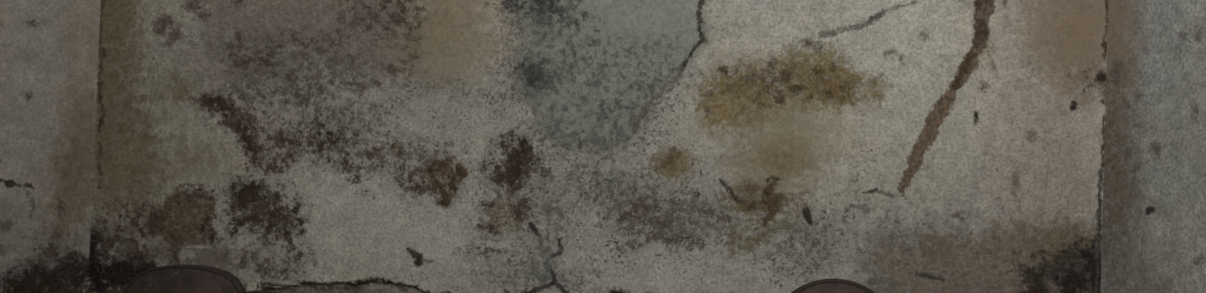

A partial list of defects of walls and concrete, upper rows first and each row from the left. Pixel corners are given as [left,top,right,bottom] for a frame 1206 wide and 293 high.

water stain [0,0,424,293]
mould [485,0,574,36]
crack [504,265,568,293]
mould [453,58,731,291]
crack [632,0,708,129]
crack [819,1,917,37]
rust [898,0,1007,193]
water stain [863,97,1139,293]